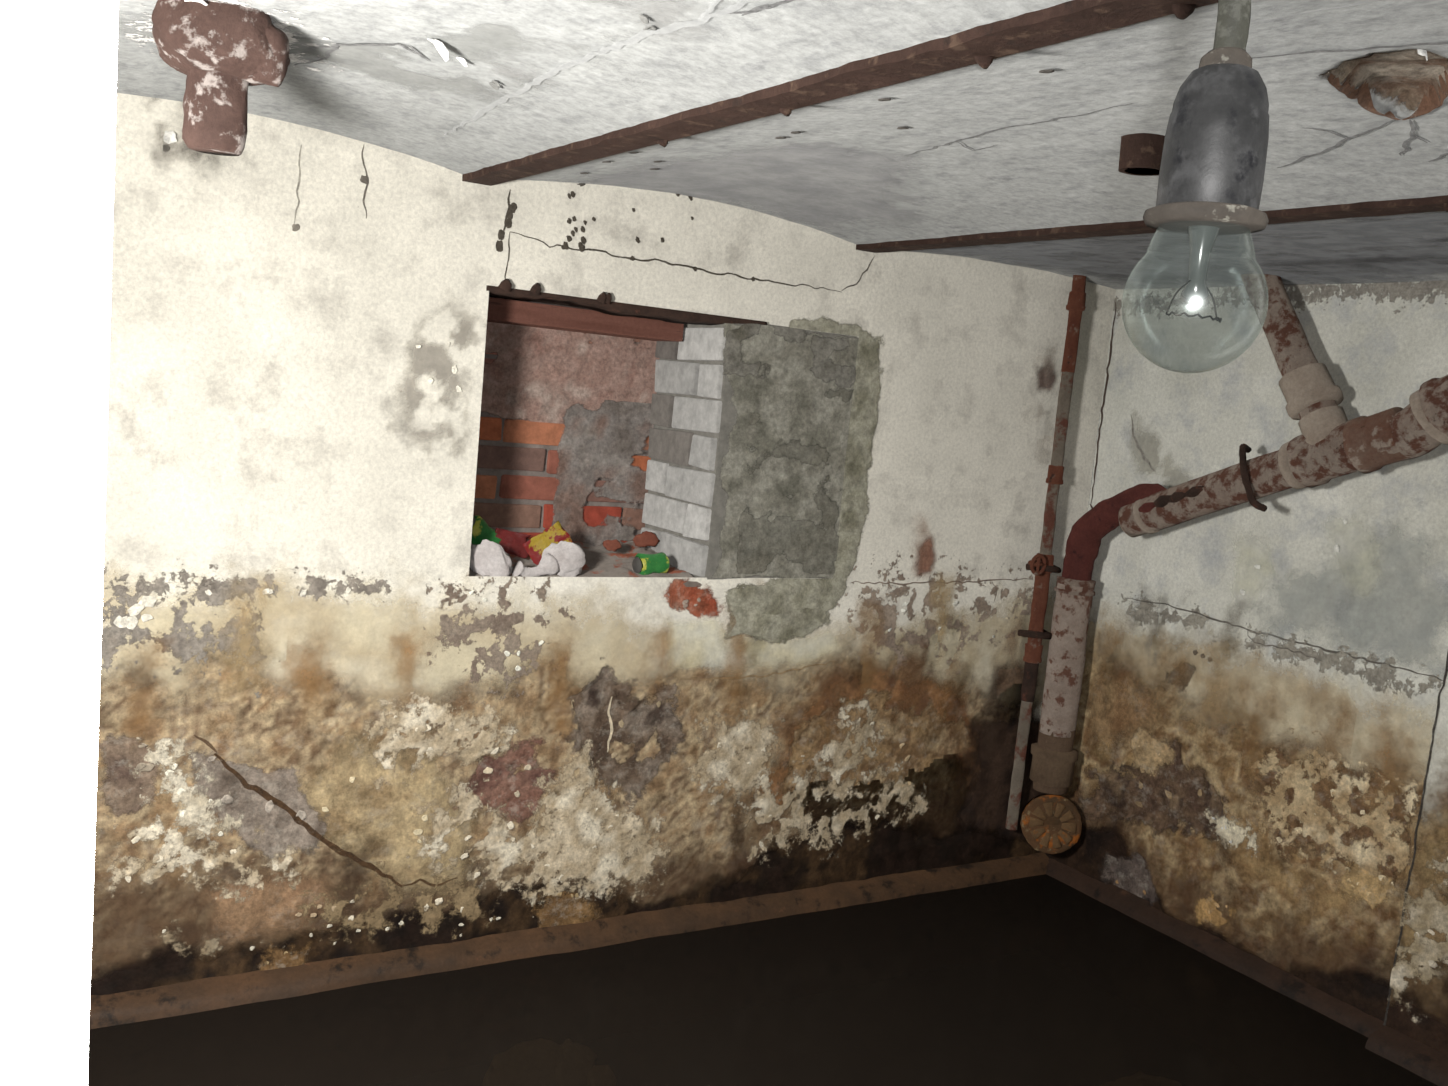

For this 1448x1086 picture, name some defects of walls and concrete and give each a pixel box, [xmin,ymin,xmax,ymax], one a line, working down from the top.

spalling [1322,49,1448,120]
crack [496,190,874,292]
peeling [101,559,392,698]
peeling [424,574,575,703]
spalling [664,579,720,617]
peeling [1118,590,1443,705]
crack [194,735,457,887]
leakage [90,581,1448,1055]
crack [1125,598,1448,1026]